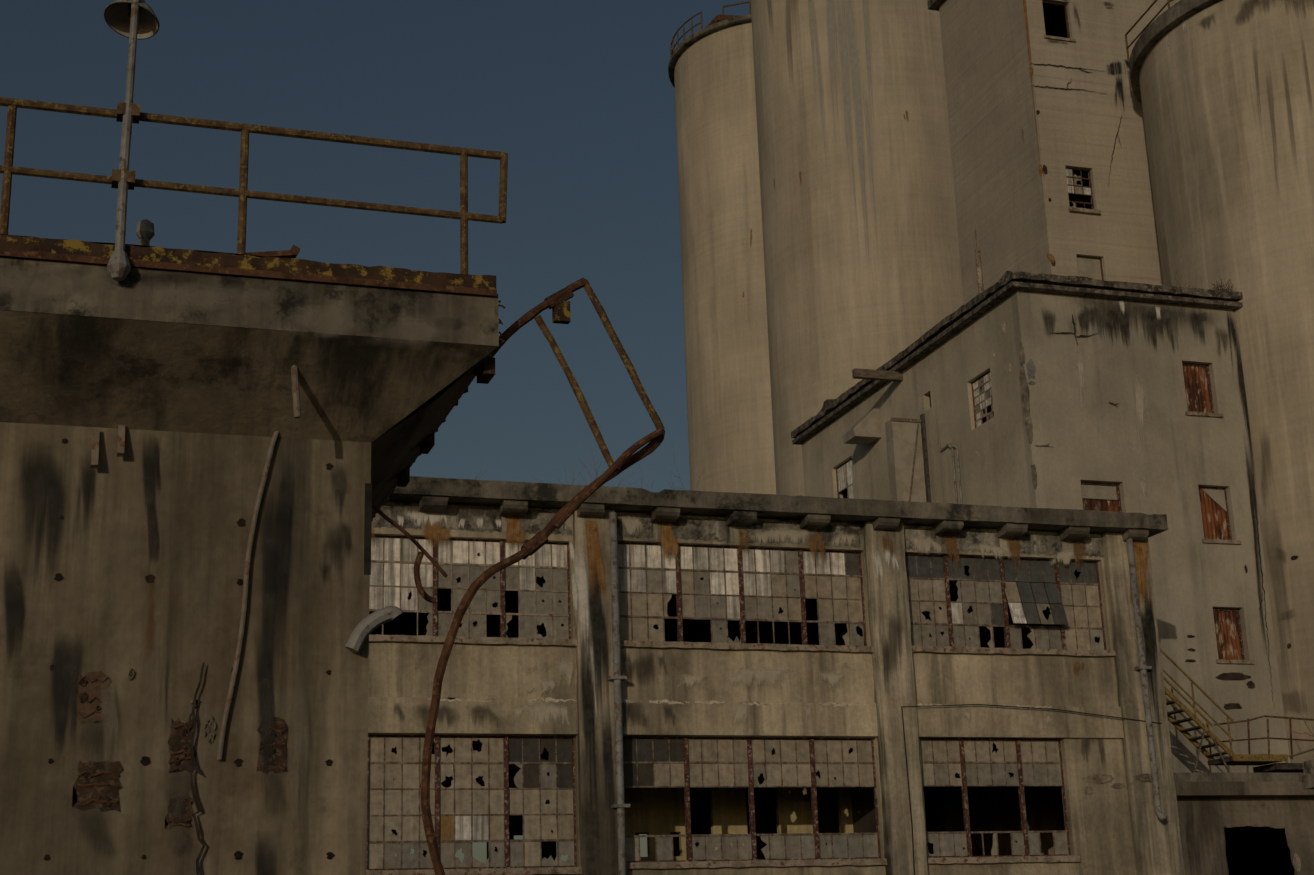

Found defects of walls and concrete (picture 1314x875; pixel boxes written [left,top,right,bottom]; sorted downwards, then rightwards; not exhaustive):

water stain [21,456,93,564]
water stain [143,444,159,558]
water stain [1079,296,1265,634]
water stain [4,573,23,653]
water stain [257,480,291,767]
water stain [52,645,80,745]
corrosion [72,671,123,846]
corrosion [165,718,196,849]
crack [186,662,206,875]
corrosion [257,717,288,805]
water stain [515,542,662,875]
water stain [256,847,274,875]